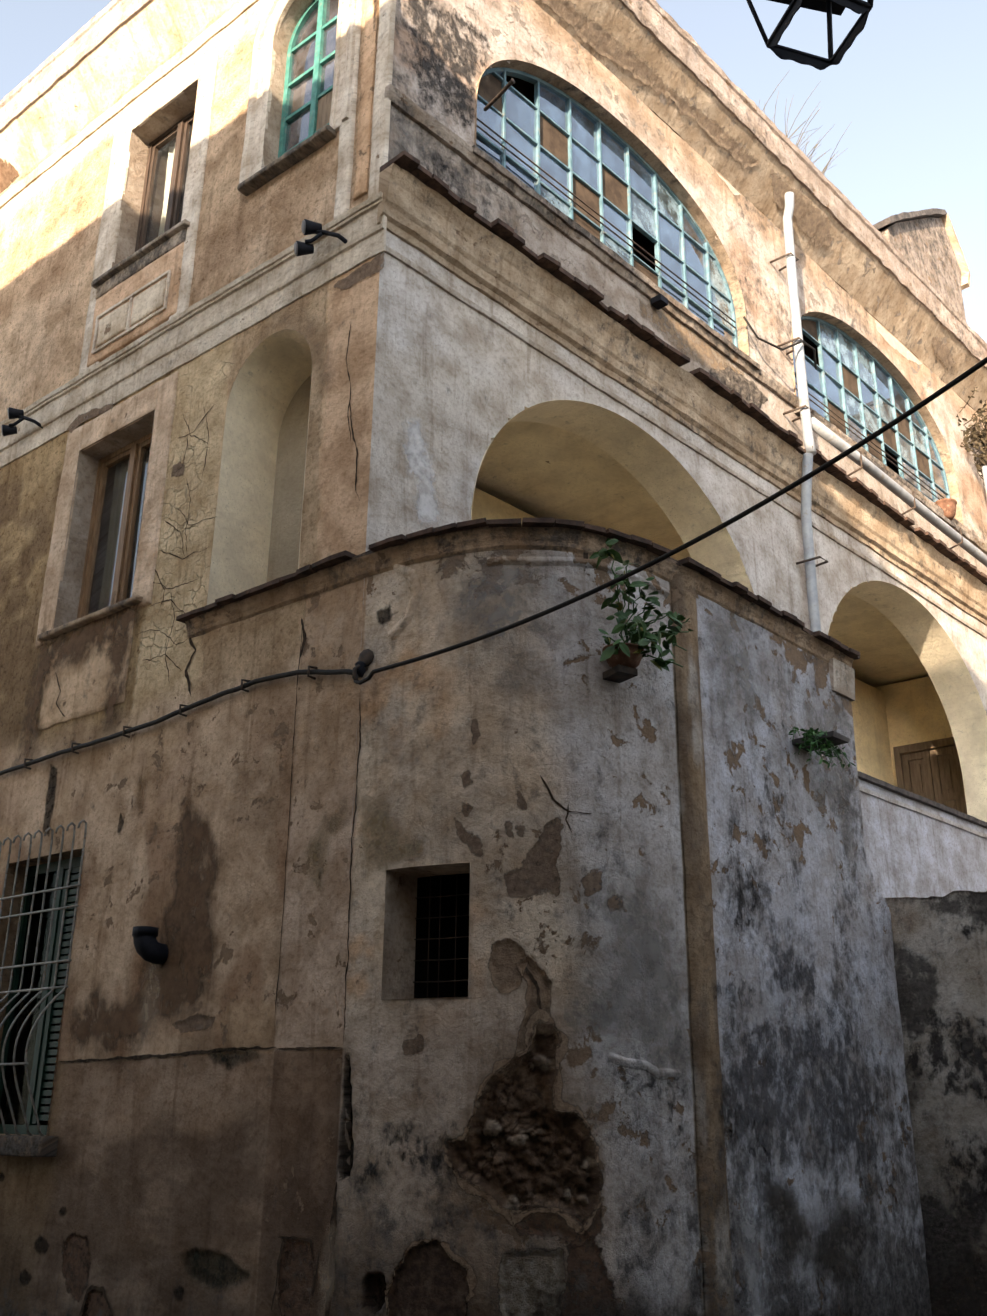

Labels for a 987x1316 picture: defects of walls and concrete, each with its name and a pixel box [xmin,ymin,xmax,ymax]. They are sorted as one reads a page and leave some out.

water stain [405,0,487,128]
crack [346,325,359,497]
crack [139,405,214,695]
flaking render [504,791,563,898]
crack [540,775,592,832]
water stain [70,802,218,1052]
water stain [714,938,817,1008]
spalling [384,938,617,1316]
water stain [732,1012,879,1169]
water stain [905,1009,987,1113]
flaking render [34,1233,113,1316]
spalling [363,1239,477,1316]